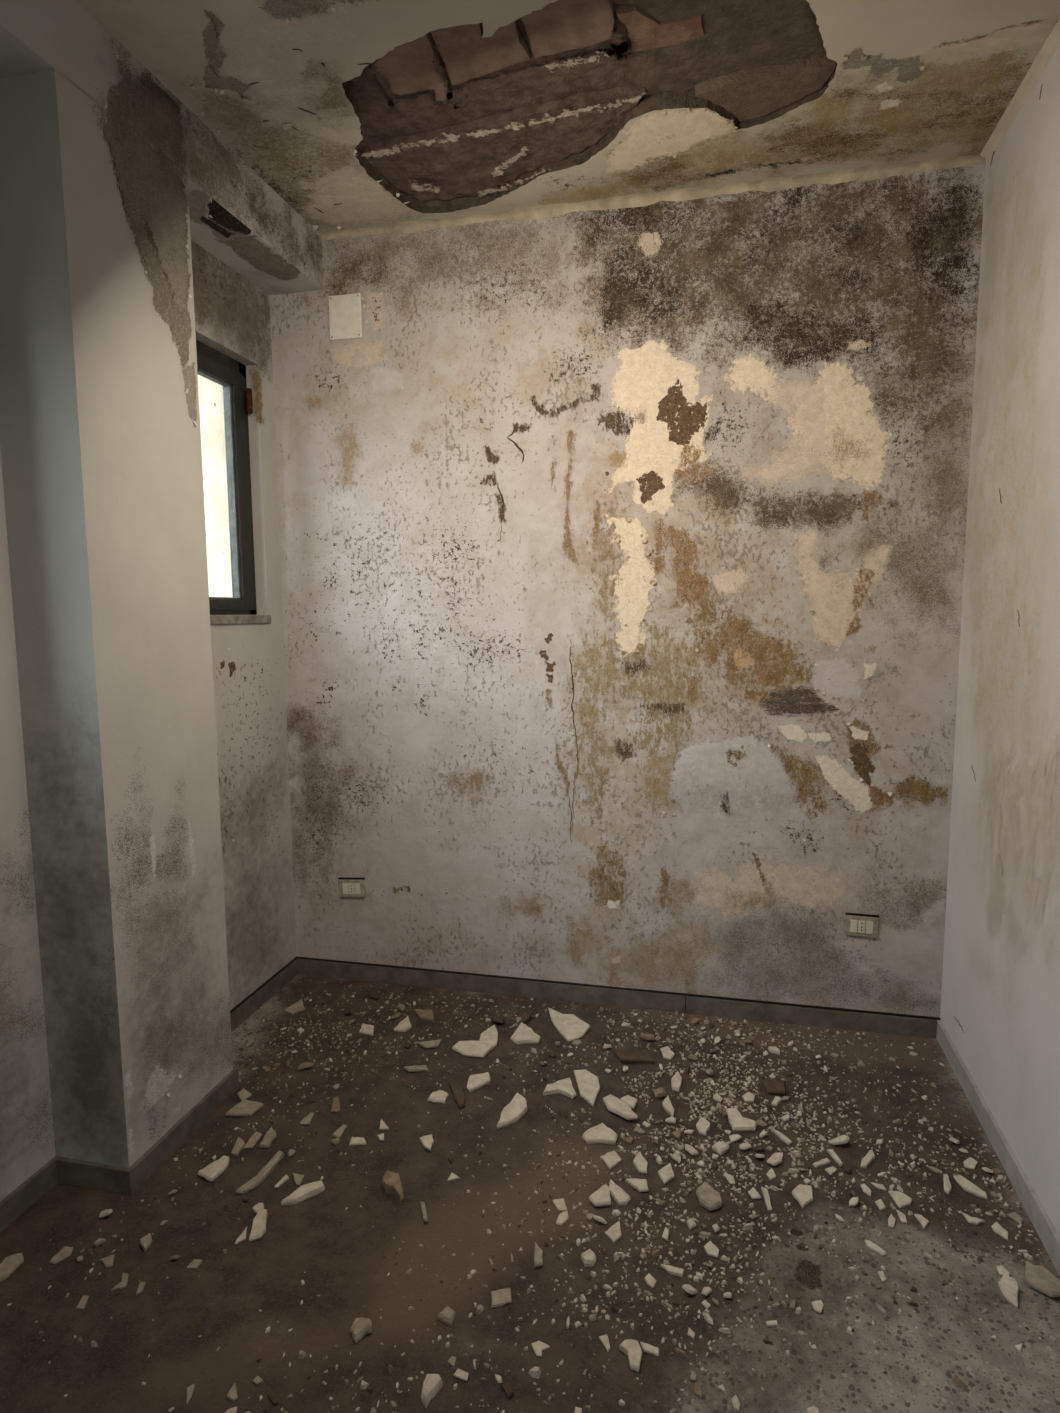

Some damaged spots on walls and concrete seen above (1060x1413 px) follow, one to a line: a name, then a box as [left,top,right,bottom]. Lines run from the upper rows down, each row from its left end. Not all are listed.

spalling [89,53,301,426]
spalling [342,0,1059,214]
damp [107,10,1060,938]
peeling [582,340,713,657]
peeling [721,339,892,523]
damp [75,744,233,1142]
damp [293,497,946,1017]